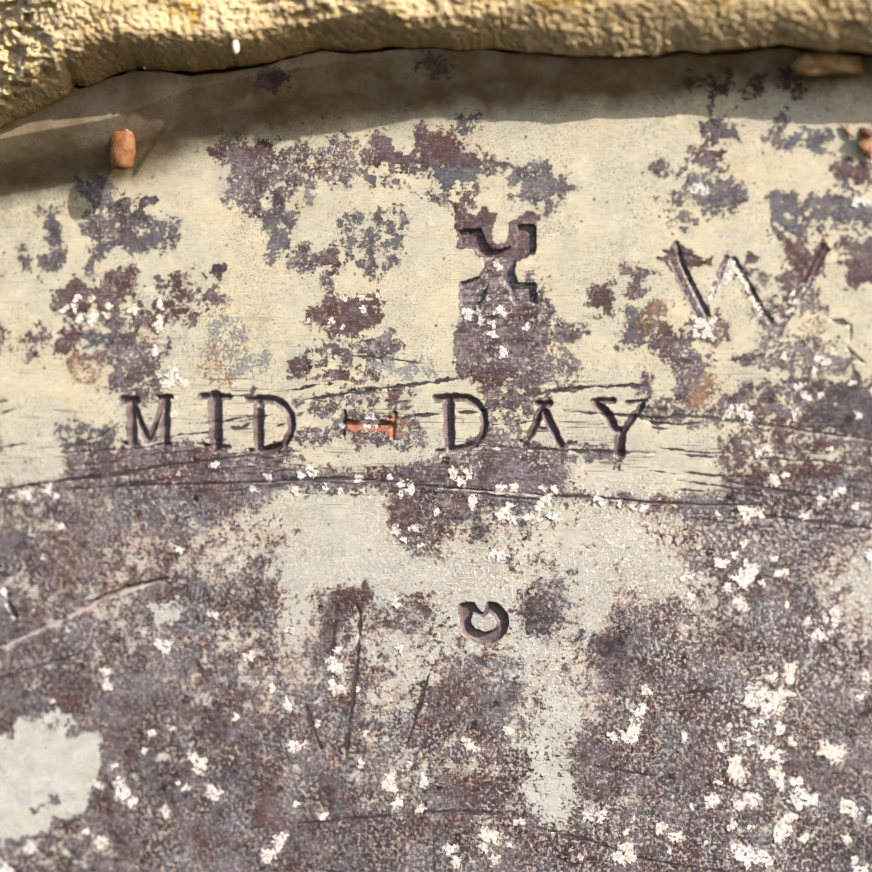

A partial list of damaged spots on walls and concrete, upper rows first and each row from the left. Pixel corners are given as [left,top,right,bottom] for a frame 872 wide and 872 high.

peeling [0,170,234,411]
peeling [190,100,872,558]
peeling [54,416,131,461]
corrosion [346,413,415,439]
corrosion [177,700,200,722]
corrosion [250,776,302,836]
corrosion [442,764,512,812]
corrosion [566,738,633,808]